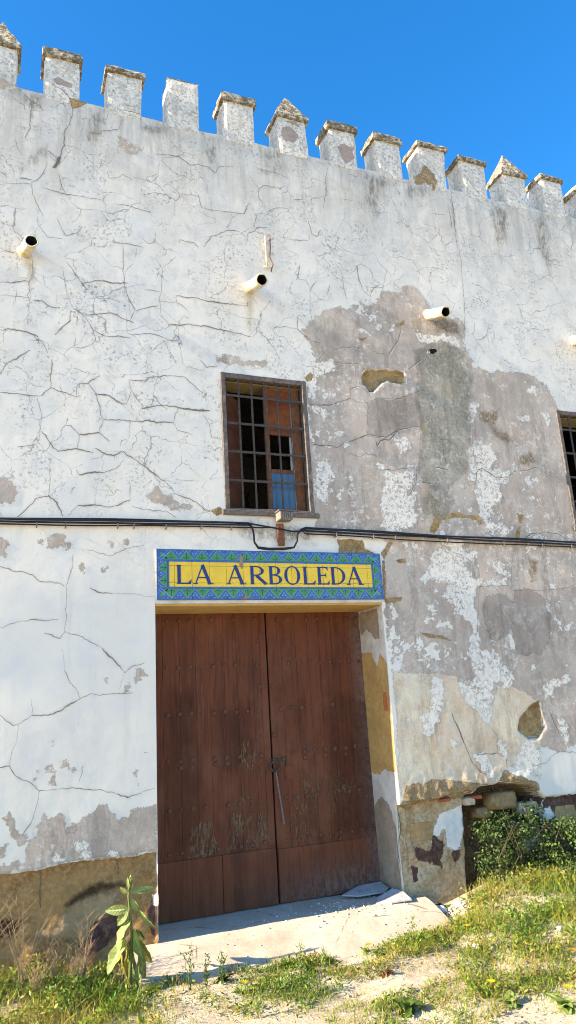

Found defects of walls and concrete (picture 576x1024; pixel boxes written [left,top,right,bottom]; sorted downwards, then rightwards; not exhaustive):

crack [0,84,423,517]
peeling [217,354,268,367]
peeling [0,478,18,504]
peeling [146,485,193,511]
crack [314,426,562,498]
peeling [37,533,71,550]
peeling [302,285,576,903]
crack [0,546,154,834]
spalling [0,804,158,977]